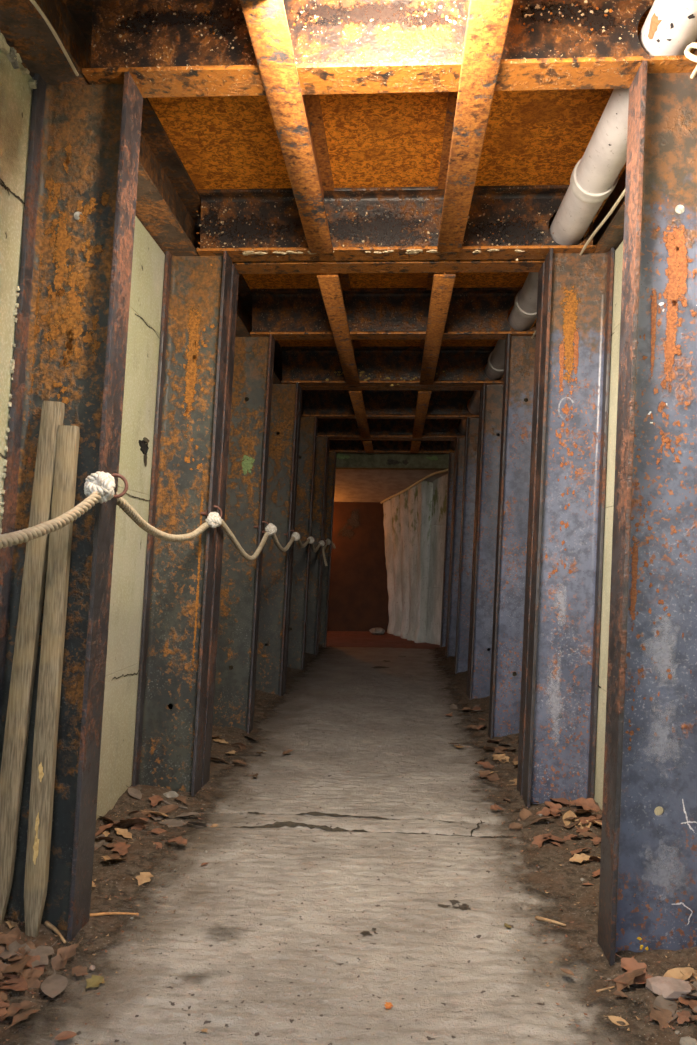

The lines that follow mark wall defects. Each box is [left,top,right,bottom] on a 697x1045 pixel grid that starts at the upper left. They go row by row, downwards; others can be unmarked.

peeling [0,33,37,90]
crack [0,179,25,204]
corrosion [27,143,110,441]
corrosion [181,307,215,670]
corrosion [545,284,583,578]
corrosion [635,221,697,465]
corrosion [625,501,672,751]